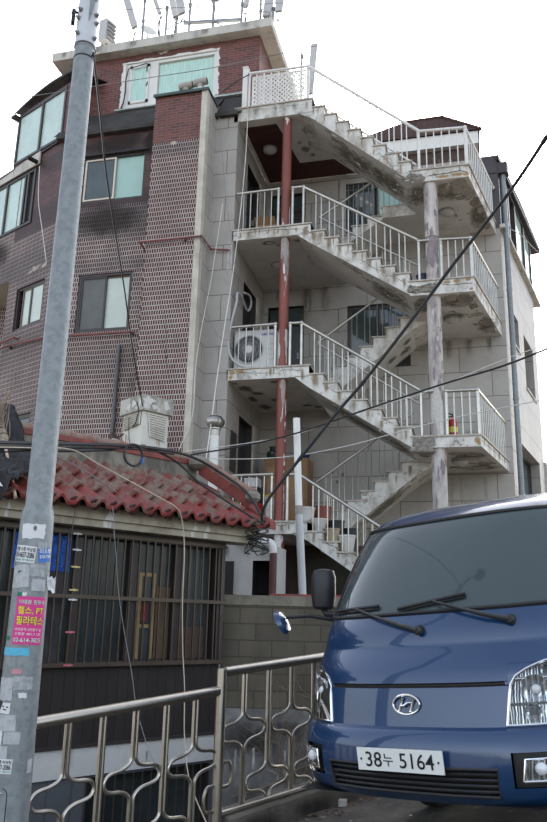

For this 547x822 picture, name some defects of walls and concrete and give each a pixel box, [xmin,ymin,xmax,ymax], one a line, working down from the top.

water stain [338,147,424,205]
peeling [325,129,484,313]
water stain [471,205,492,227]
peeling [271,379,286,430]
peeling [321,294,497,483]